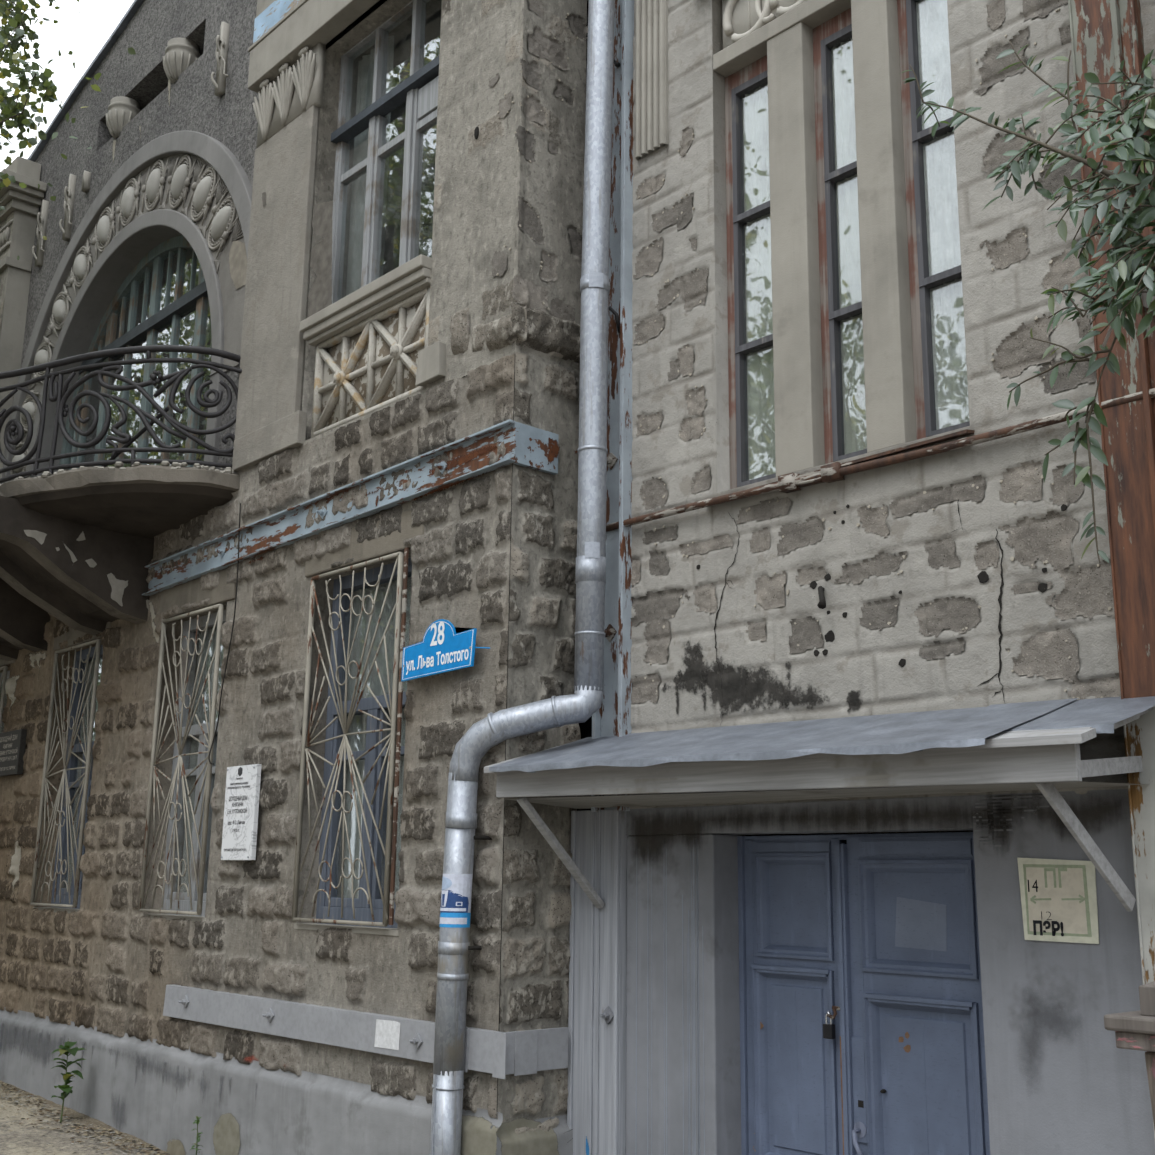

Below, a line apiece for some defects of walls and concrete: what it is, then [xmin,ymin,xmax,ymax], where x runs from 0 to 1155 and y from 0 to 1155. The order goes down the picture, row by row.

peeling [24,530,97,568]
peeling [107,573,128,606]
crack [714,511,739,663]
water stain [662,641,828,716]
spalling [630,460,1121,704]
crack [978,529,1005,702]